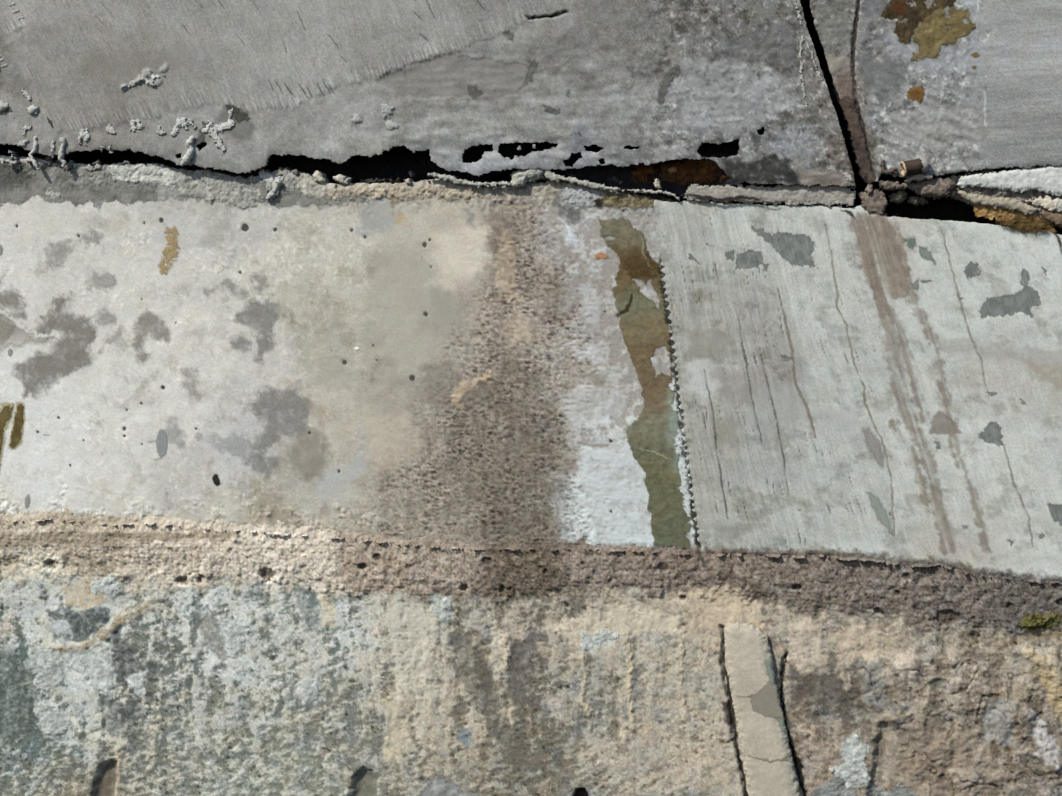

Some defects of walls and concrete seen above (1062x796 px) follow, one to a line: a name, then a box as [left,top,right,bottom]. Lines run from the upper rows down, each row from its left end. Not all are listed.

corrosion [881,0,976,61]
crack [0,142,280,177]
peeling [225,105,250,122]
spalling [263,142,558,201]
crack [485,146,576,185]
damp [563,187,600,209]
peeling [544,71,897,207]
corrosion [907,85,924,102]
crack [620,0,1011,535]
damp [204,279,277,361]
damp [0,292,121,465]
crack [721,625,807,796]